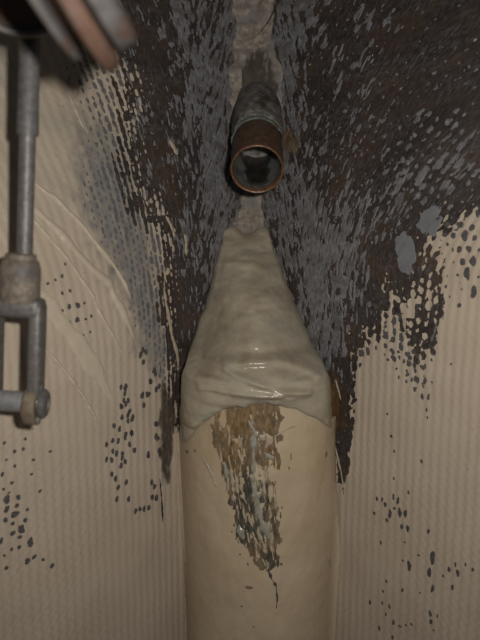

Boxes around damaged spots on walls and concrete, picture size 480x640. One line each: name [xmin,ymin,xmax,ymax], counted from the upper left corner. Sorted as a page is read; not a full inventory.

water stain [242,50,278,94]
water stain [159,383,175,483]
peeling [211,403,292,571]